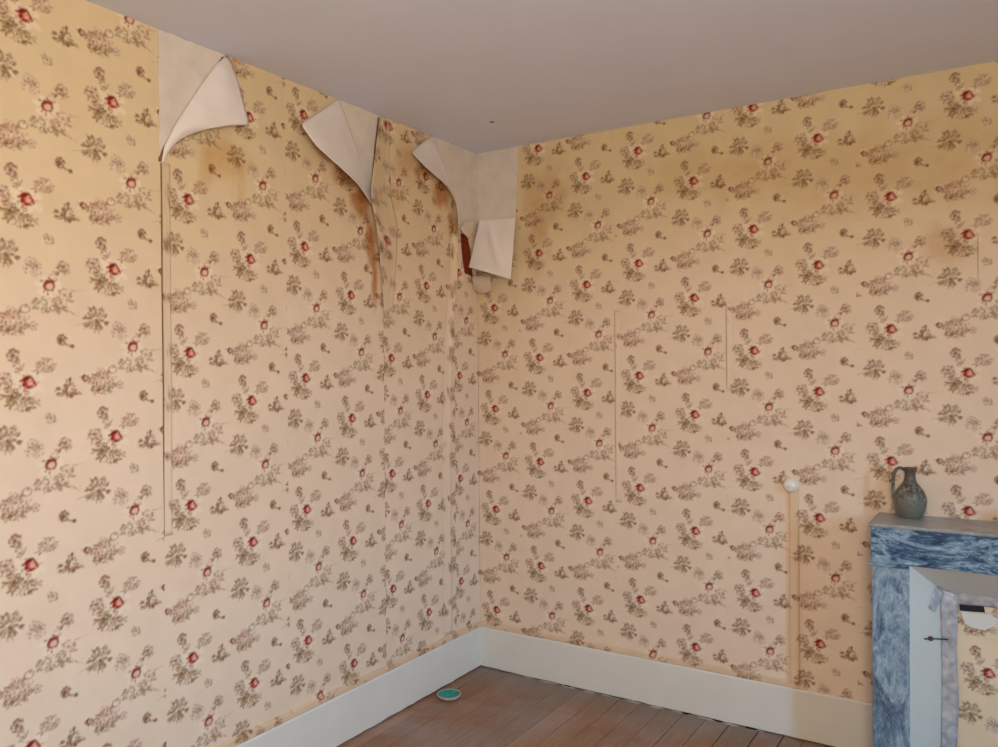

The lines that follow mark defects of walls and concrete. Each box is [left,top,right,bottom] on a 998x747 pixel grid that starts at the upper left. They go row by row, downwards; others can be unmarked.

flaking render [158,30,224,165]
flaking render [339,100,381,188]
flaking render [431,136,519,235]